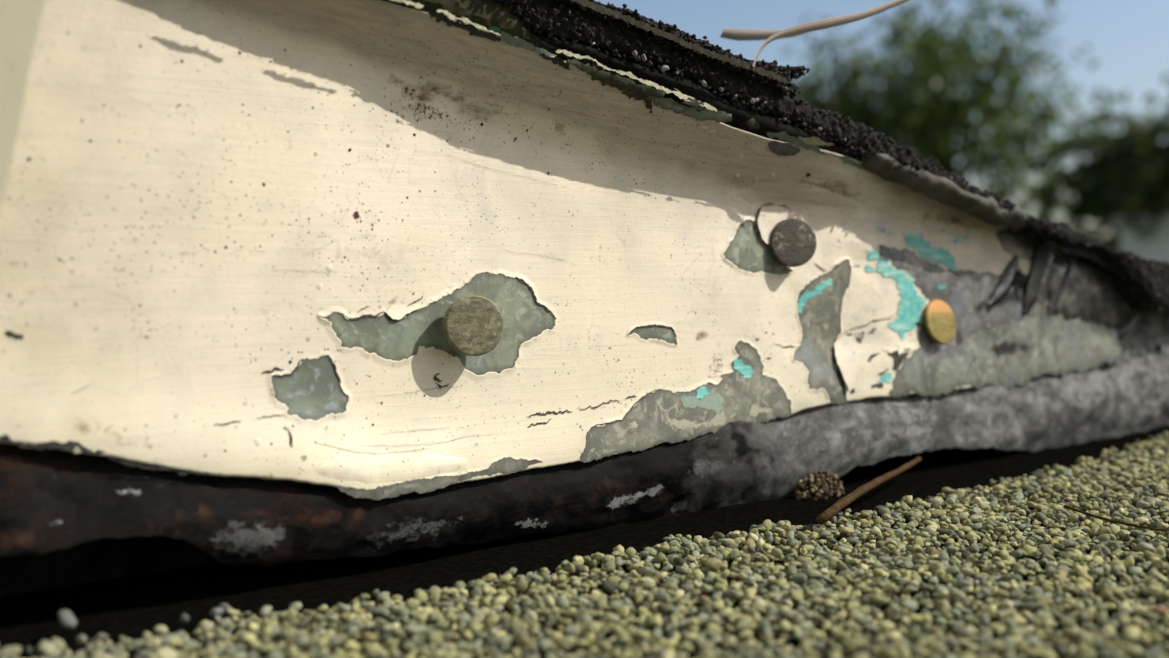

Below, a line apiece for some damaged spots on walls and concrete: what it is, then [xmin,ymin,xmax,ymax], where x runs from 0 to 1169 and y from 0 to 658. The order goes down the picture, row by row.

peeling [265,266,560,427]
peeling [337,454,542,500]
peeling [626,321,679,348]
peeling [579,337,793,463]
peeling [720,205,860,405]
peeling [879,228,1123,398]